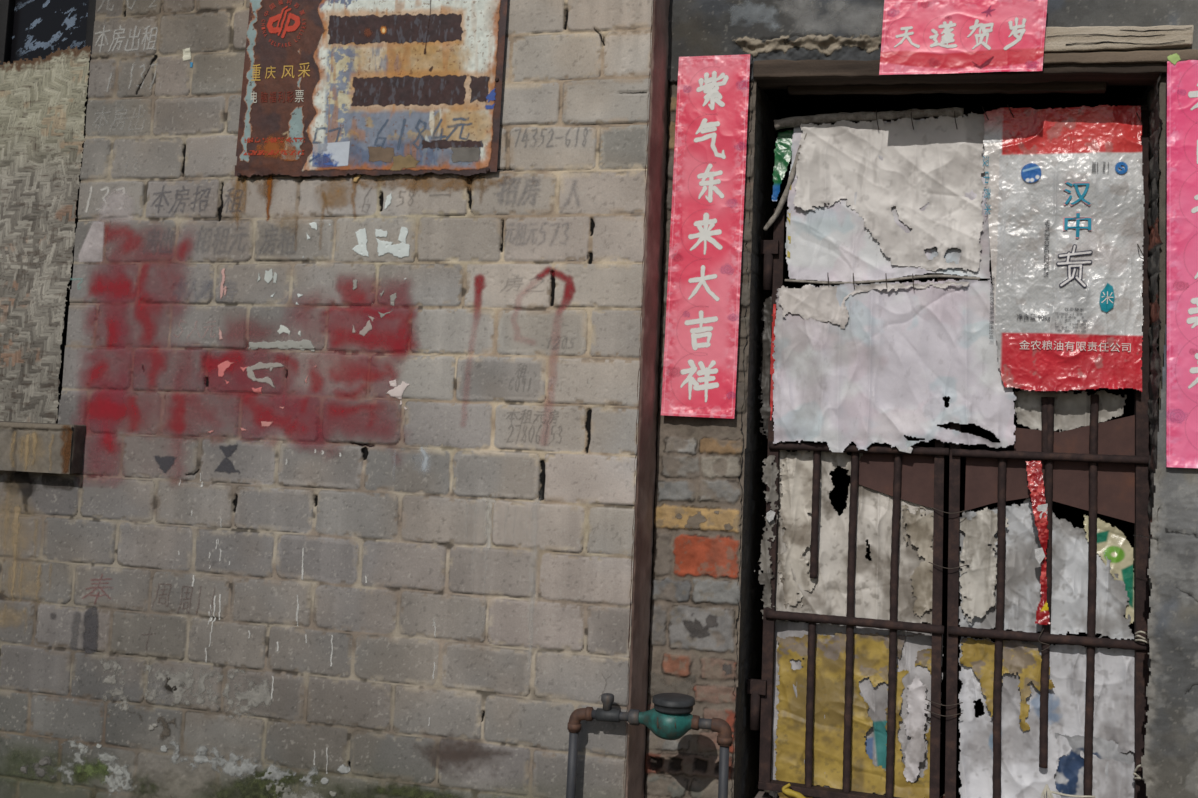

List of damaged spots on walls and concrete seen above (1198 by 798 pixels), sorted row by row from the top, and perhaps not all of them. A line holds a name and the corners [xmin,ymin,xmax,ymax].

spalling [735,34,882,57]
crack [136,55,157,95]
corrosion [61,426,73,473]